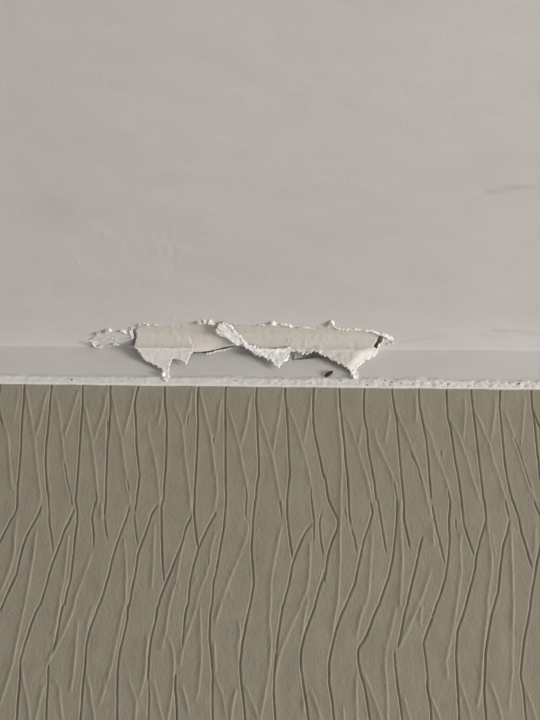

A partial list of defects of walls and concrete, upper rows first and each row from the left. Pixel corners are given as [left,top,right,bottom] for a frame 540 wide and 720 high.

peeling [80,319,394,381]